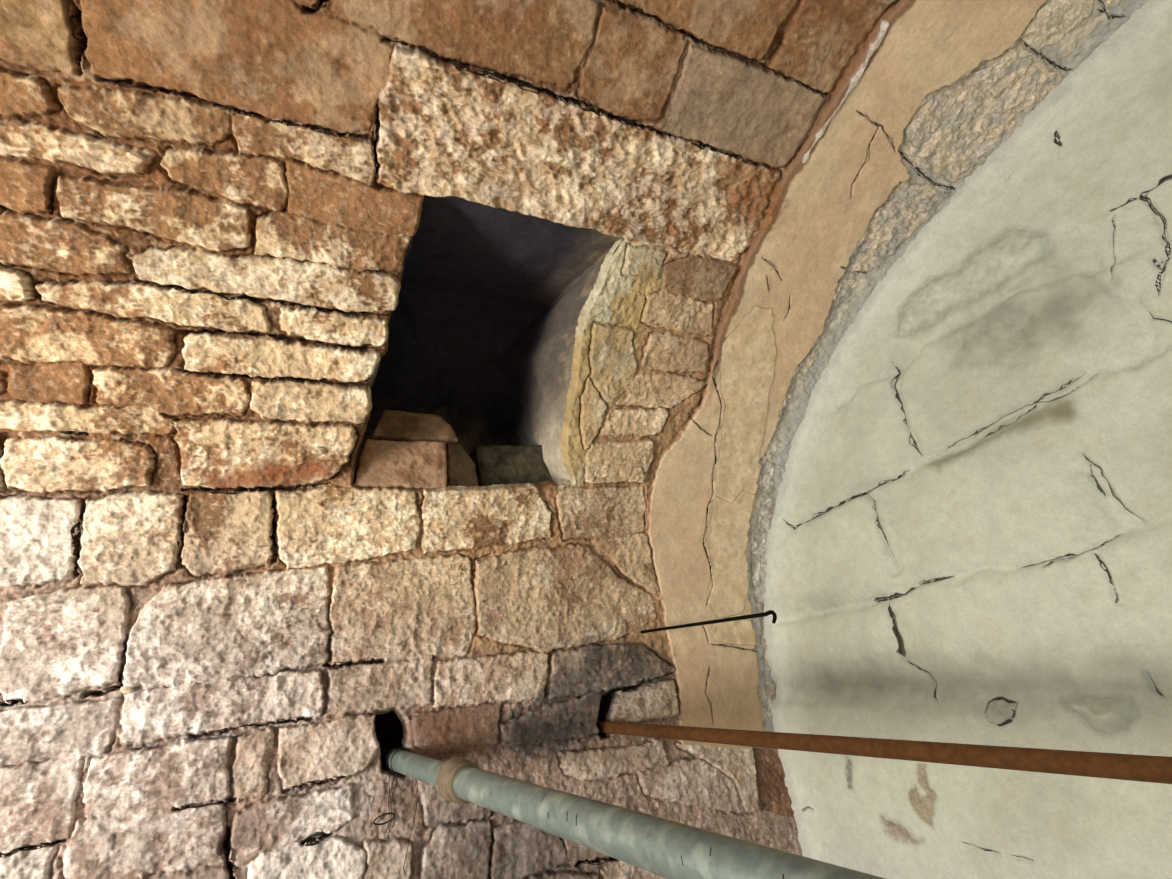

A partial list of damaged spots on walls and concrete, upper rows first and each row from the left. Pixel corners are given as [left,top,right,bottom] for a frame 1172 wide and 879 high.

crack [851,111,956,195]
crack [762,257,791,318]
crack [1109,175,1172,323]
flaking render [707,0,1112,717]
crack [783,362,1095,560]
crack [1021,453,1145,603]
crack [874,575,955,700]
flaking render [984,697,1017,726]
flaking render [909,765,936,825]